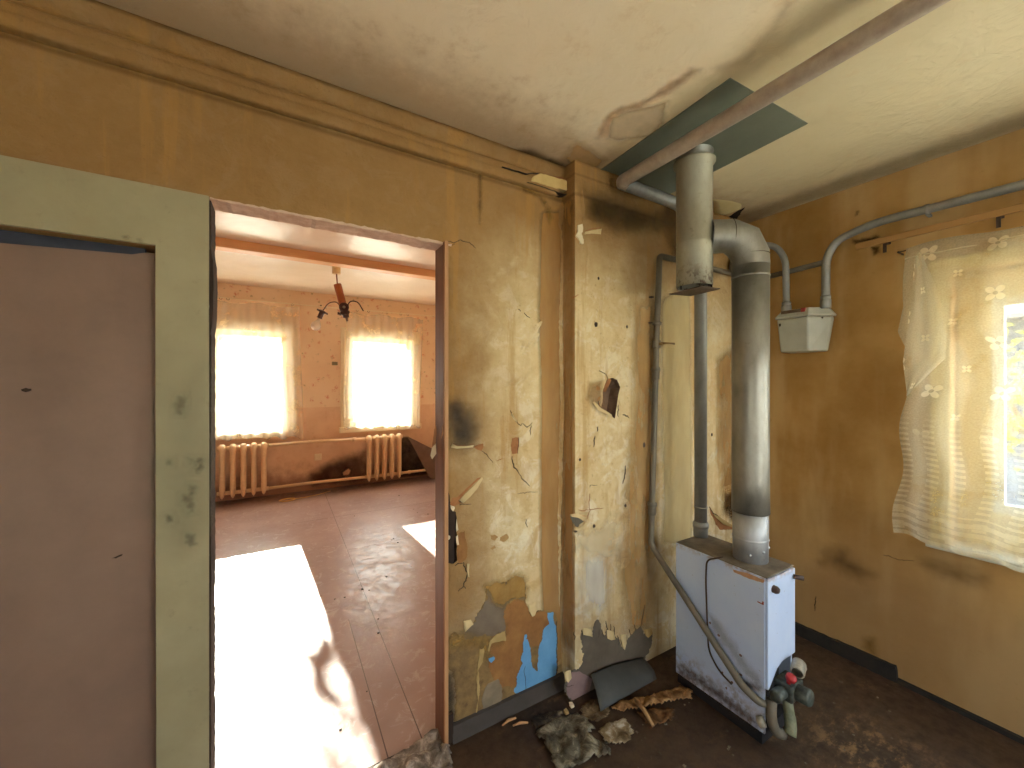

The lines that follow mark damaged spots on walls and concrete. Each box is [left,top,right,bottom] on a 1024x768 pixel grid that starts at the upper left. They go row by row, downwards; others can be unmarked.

damp [611,92,664,139]
damp [521,146,601,167]
spalling [589,370,629,418]
damp [311,456,364,485]
damp [401,437,427,477]
crack [482,410,532,494]
spalling [448,492,468,564]
peeling [448,575,653,722]